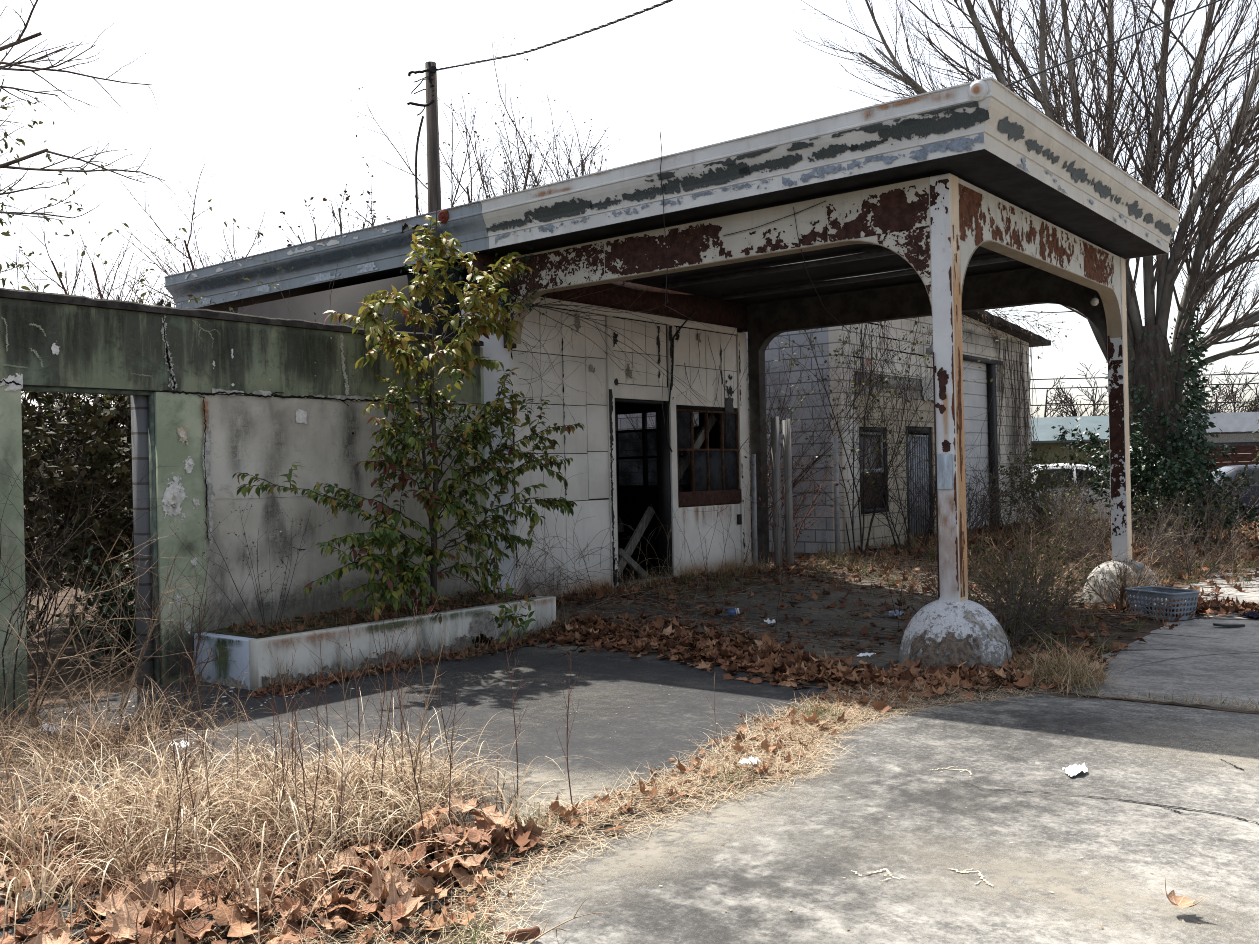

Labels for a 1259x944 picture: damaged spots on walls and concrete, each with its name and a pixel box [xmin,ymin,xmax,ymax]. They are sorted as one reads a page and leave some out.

peeling [486,101,1175,247]
spalling [162,409,216,544]
corrosion [509,179,1114,597]
corrosion [1108,360,1127,536]
crack [932,766,1259,824]
crack [948,868,993,886]